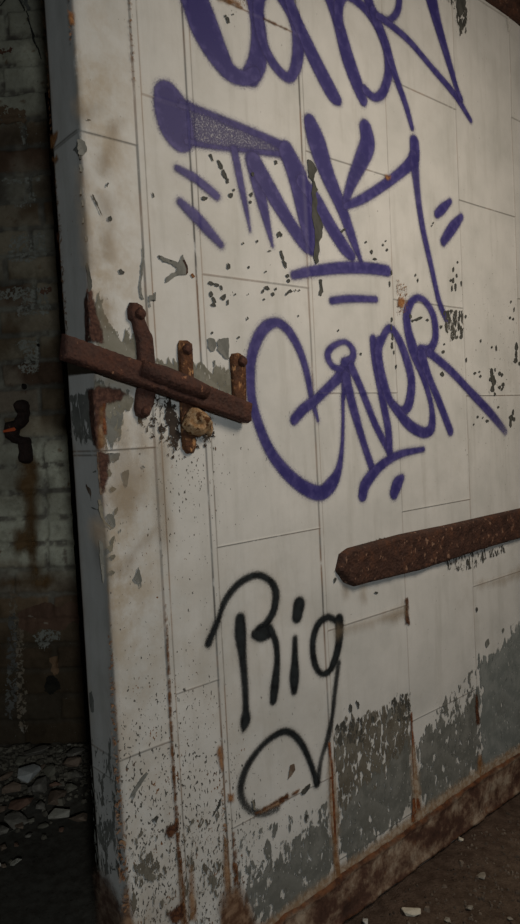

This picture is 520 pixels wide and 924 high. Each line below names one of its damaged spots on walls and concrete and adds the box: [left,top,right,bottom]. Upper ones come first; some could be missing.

rust [84,289,103,343]
rust [87,386,125,493]
peeling [445,545,506,571]
rust [166,628,195,924]
rust [220,789,255,924]
rust [256,790,299,814]
peeling [91,621,520,924]
rust [268,712,520,924]